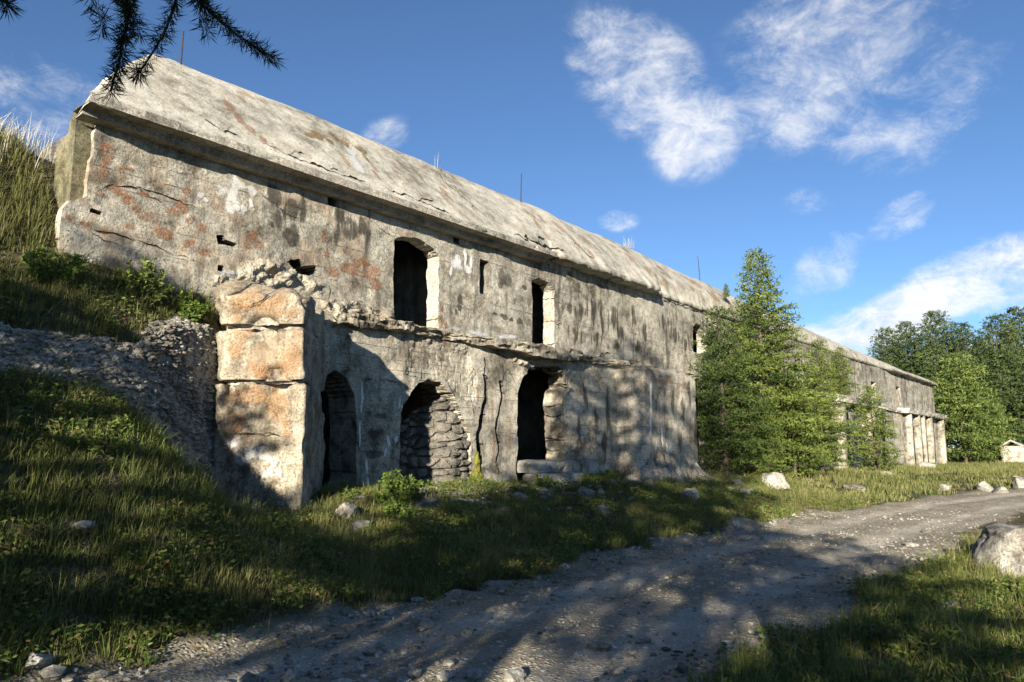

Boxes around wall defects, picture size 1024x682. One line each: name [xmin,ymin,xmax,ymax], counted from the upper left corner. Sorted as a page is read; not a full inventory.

crack [266,143,363,181]
crack [102,184,197,208]
corrosion [96,143,210,255]
crack [90,229,204,266]
corrosion [321,232,382,290]
water stain [334,207,370,245]
spalling [216,254,394,319]
water stain [561,300,647,350]
water stain [659,315,689,353]
flaking render [406,327,517,403]
crack [472,357,516,474]